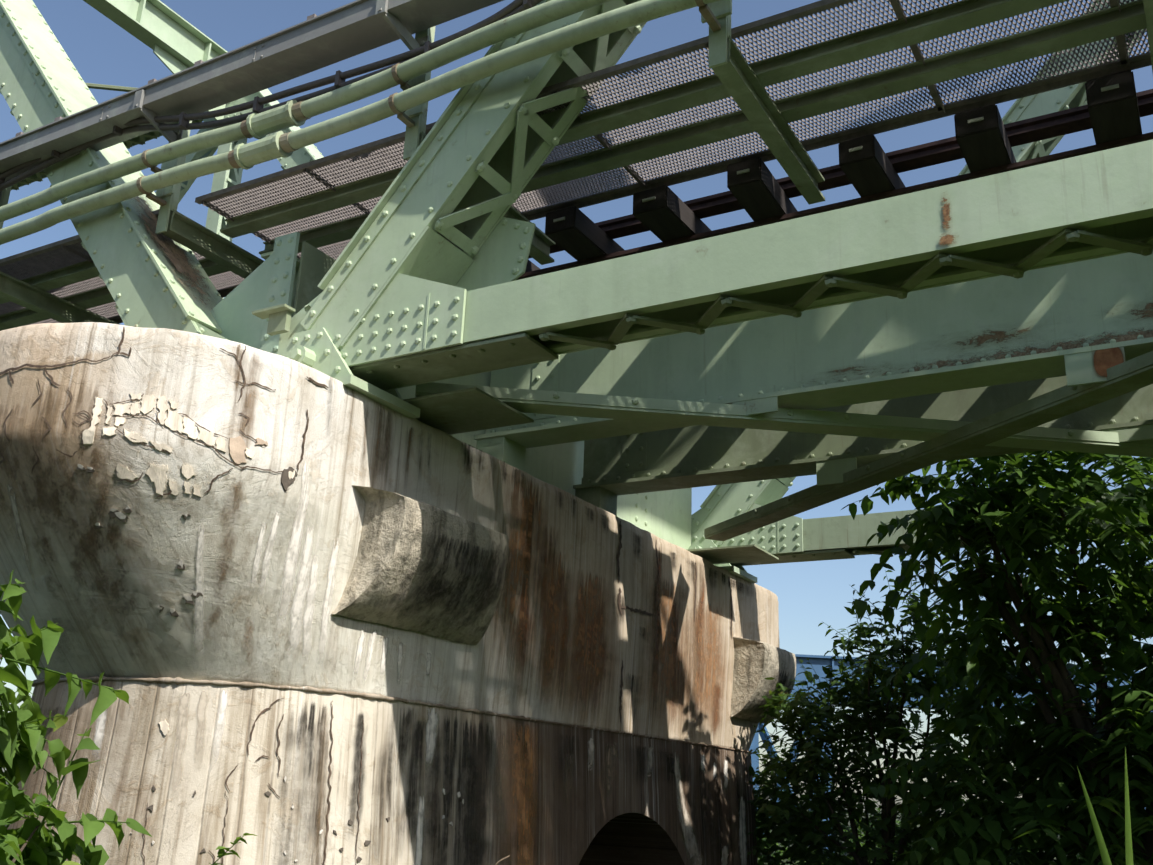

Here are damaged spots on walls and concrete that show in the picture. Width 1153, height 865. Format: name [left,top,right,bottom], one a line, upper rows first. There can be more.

rust [940,197,956,245]
rust [882,303,1153,377]
crack [0,326,329,498]
peeling [82,393,268,497]
water stain [290,704,326,782]
water stain [351,714,364,823]
water stain [380,708,505,865]
rust [496,479,544,657]
crack [617,660,625,722]
crack [617,521,659,653]
rust [652,548,724,729]